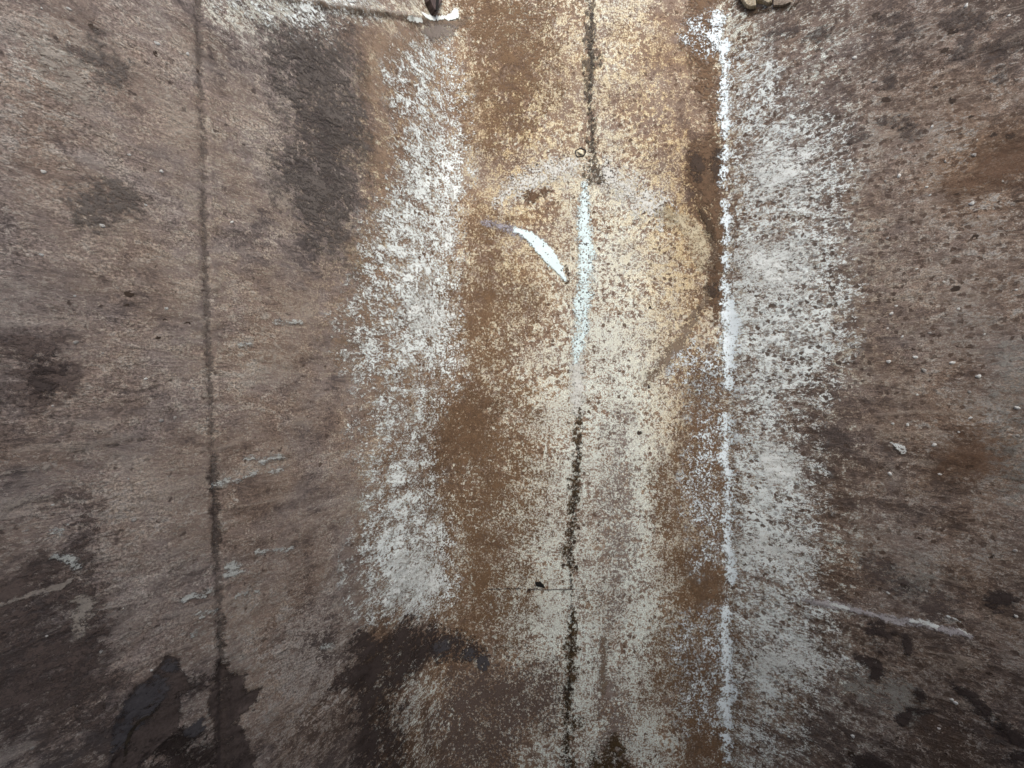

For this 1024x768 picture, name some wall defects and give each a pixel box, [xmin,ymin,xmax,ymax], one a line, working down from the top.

leakage [253,3,375,283]
rust [444,0,566,167]
rust [523,187,551,204]
crack [580,0,607,185]
leakage [763,22,834,43]
leakage [848,114,925,144]
leakage [874,9,933,90]
leakage [940,7,1024,84]
rust [417,203,557,660]
rust [637,339,753,768]
leakage [327,612,578,768]